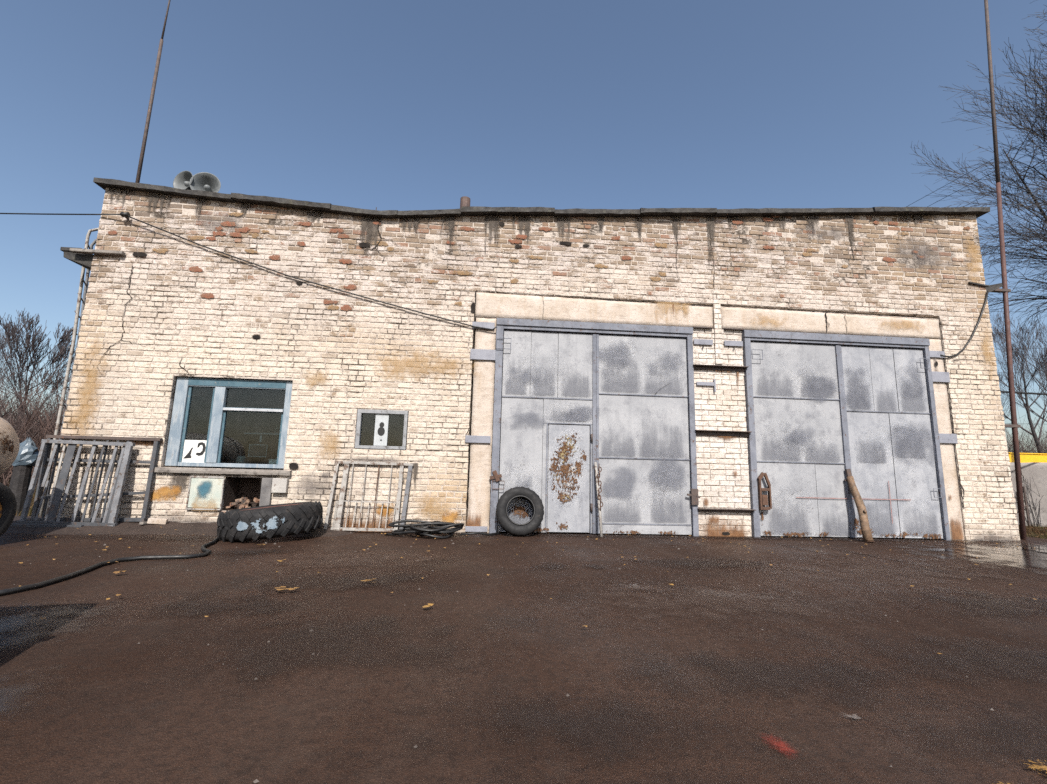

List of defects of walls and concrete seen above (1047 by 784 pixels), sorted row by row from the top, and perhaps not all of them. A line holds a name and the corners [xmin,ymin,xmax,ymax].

water stain [361,216,379,246]
water stain [401,217,418,231]
water stain [442,216,454,236]
water stain [485,215,500,251]
water stain [513,215,530,242]
water stain [557,216,570,235]
water stain [671,216,681,237]
crack [97,266,140,374]